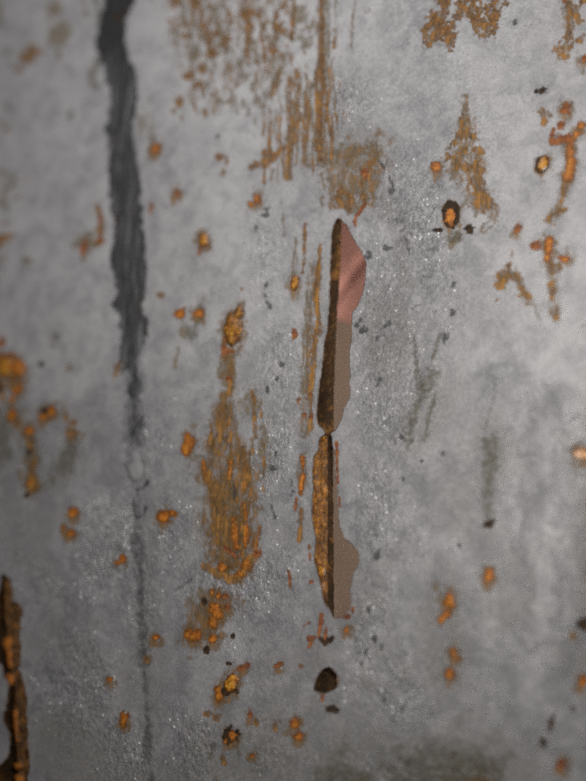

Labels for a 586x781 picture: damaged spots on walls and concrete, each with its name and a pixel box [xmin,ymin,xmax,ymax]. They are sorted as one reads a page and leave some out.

corrosion [420,0,510,52]
corrosion [552,0,586,74]
corrosion [164,0,382,226]
corrosion [430,95,497,249]
corrosion [535,102,586,226]
corrosion [494,252,538,316]
corrosion [529,236,573,320]
corrosion [289,223,323,434]
corrosion [181,301,267,654]
peeling [317,563,325,593]
peeling [2,637,15,687]
peeling [14,762,24,781]